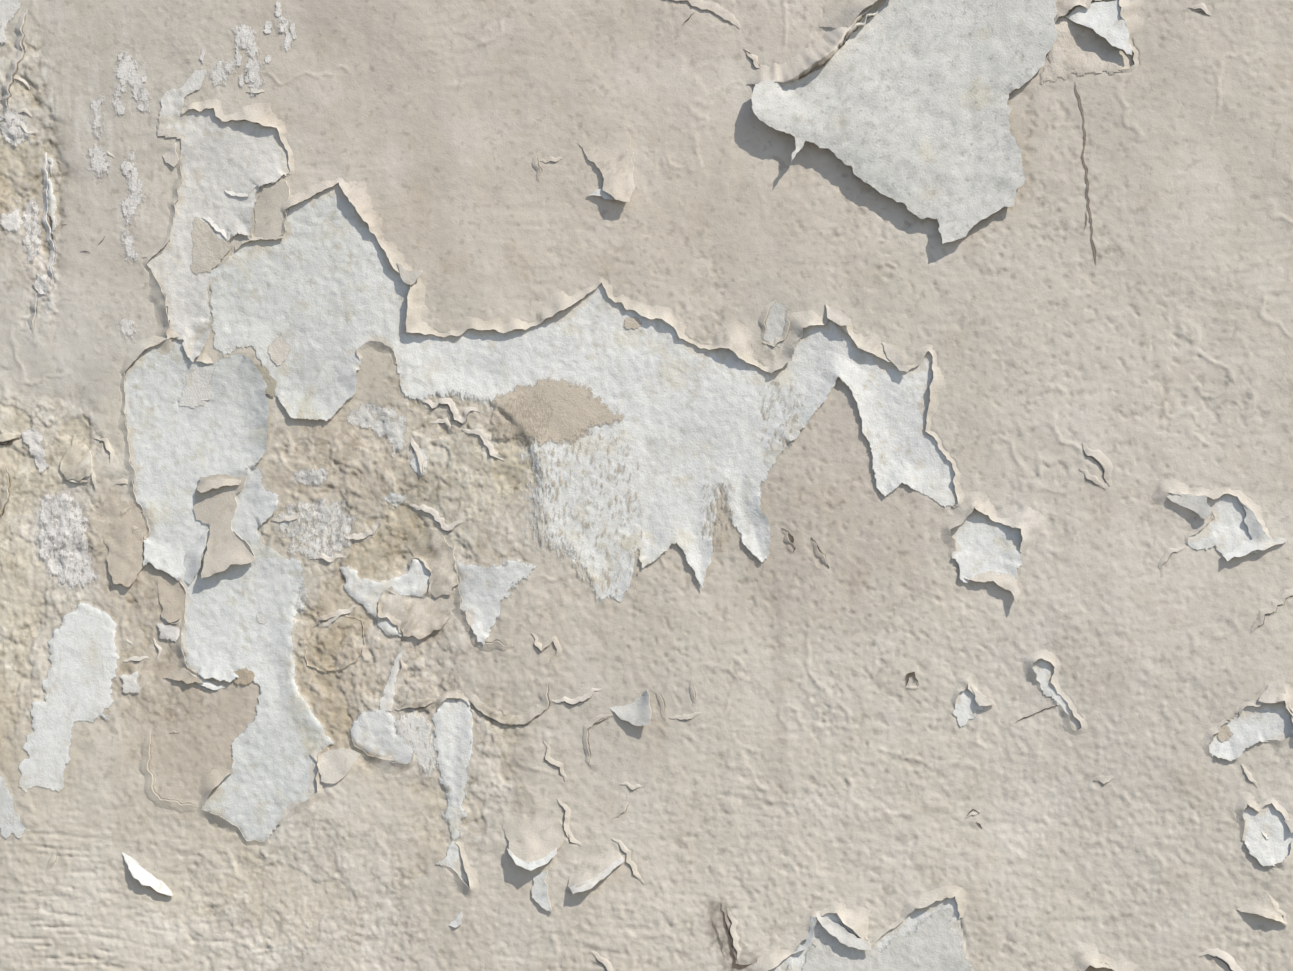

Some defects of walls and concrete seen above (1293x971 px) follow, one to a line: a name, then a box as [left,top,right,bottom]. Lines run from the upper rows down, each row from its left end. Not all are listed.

spalling [1041,0,1145,85]
crack [1075,84,1096,262]
peeling [0,69,1046,928]
spalling [1151,478,1287,577]
spalling [1202,679,1293,870]
peeling [592,951,614,971]
peeling [749,885,974,971]
peeling [1068,942,1138,971]
spalling [1199,948,1243,971]